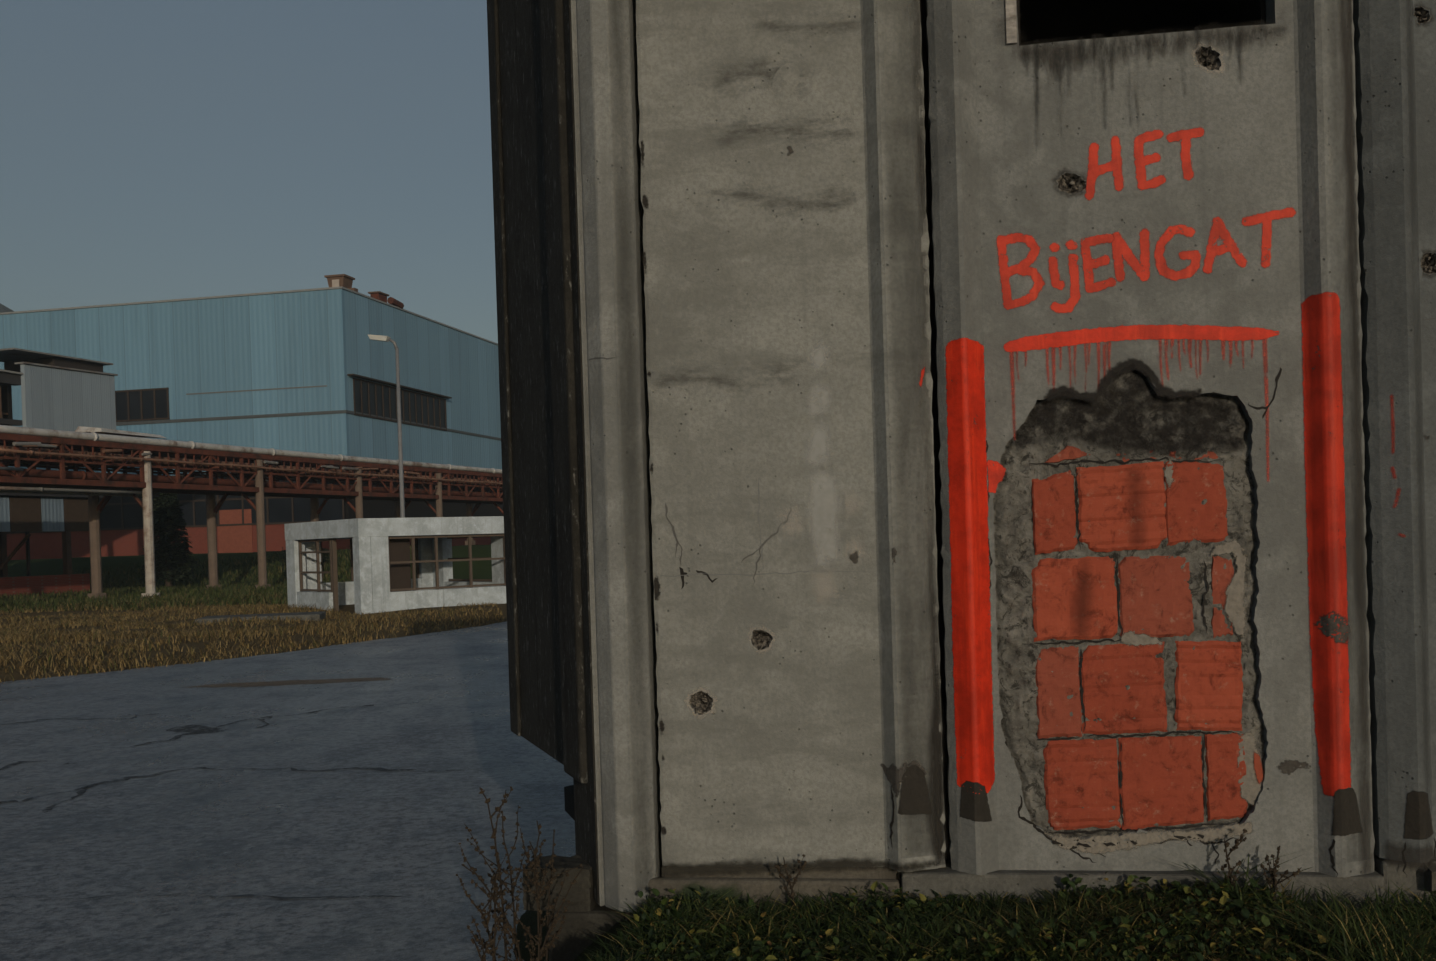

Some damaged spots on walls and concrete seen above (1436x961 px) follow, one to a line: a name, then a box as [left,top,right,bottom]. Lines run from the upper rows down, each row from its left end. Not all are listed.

spalling [1414,5,1433,24]
damp [1021,28,1272,100]
spalling [1192,44,1224,72]
spalling [1054,171,1086,196]
spalling [1420,251,1436,277]
crack [1248,368,1282,418]
crack [656,479,872,588]
spalling [750,628,774,652]
spalling [686,688,716,718]
spalling [1044,822,1253,854]